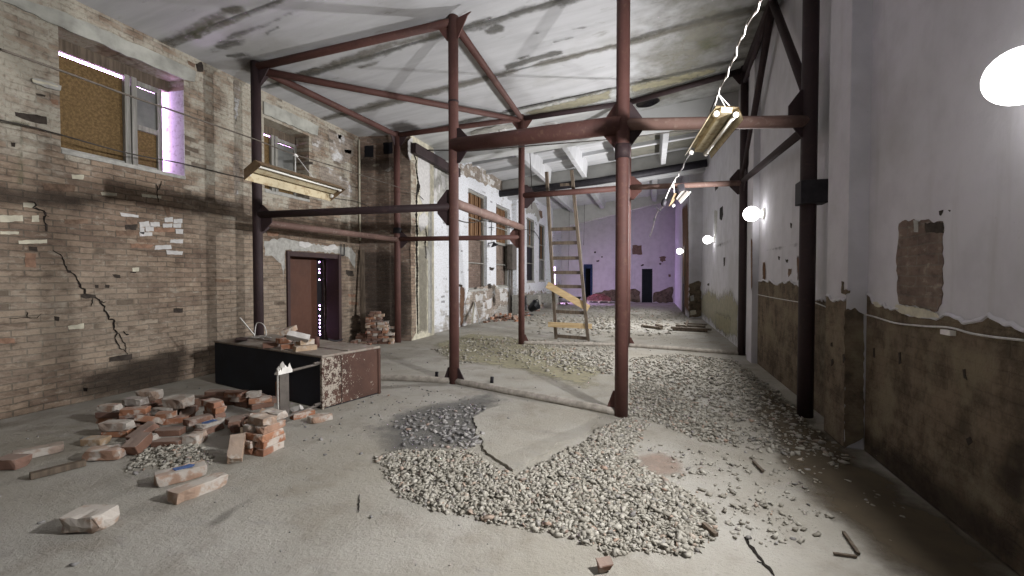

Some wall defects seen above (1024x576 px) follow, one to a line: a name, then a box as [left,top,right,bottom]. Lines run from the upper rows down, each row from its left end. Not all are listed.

damp [463,0,575,34]
damp [630,7,765,44]
damp [266,33,444,88]
damp [323,45,616,120]
damp [630,58,744,91]
crack [27,201,132,362]
peeling [116,213,183,255]
peeling [264,231,356,279]
flaking render [407,138,509,339]
flaking render [757,256,798,395]
flaking render [814,210,1024,576]